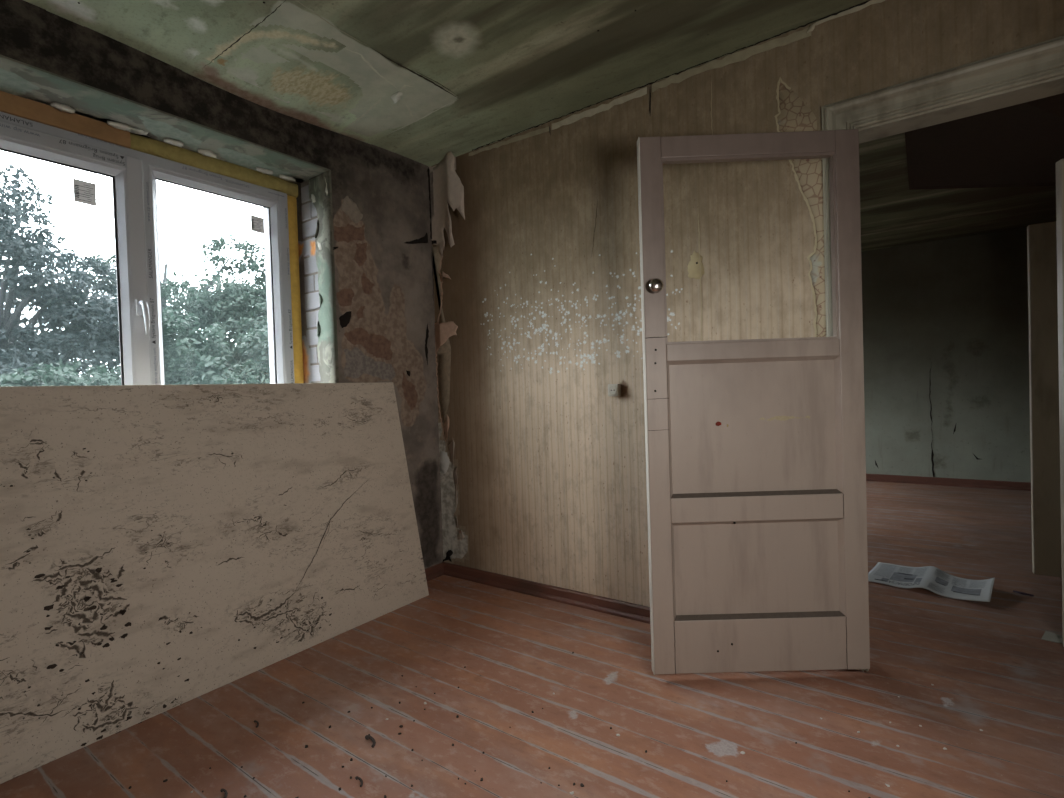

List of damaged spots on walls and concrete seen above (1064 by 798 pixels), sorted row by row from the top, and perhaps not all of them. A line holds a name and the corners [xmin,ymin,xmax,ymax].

crack [207,0,457,97]
crack [472,0,871,151]
peeling [0,65,451,442]
leakage [481,258,642,374]
crack [929,369,956,477]